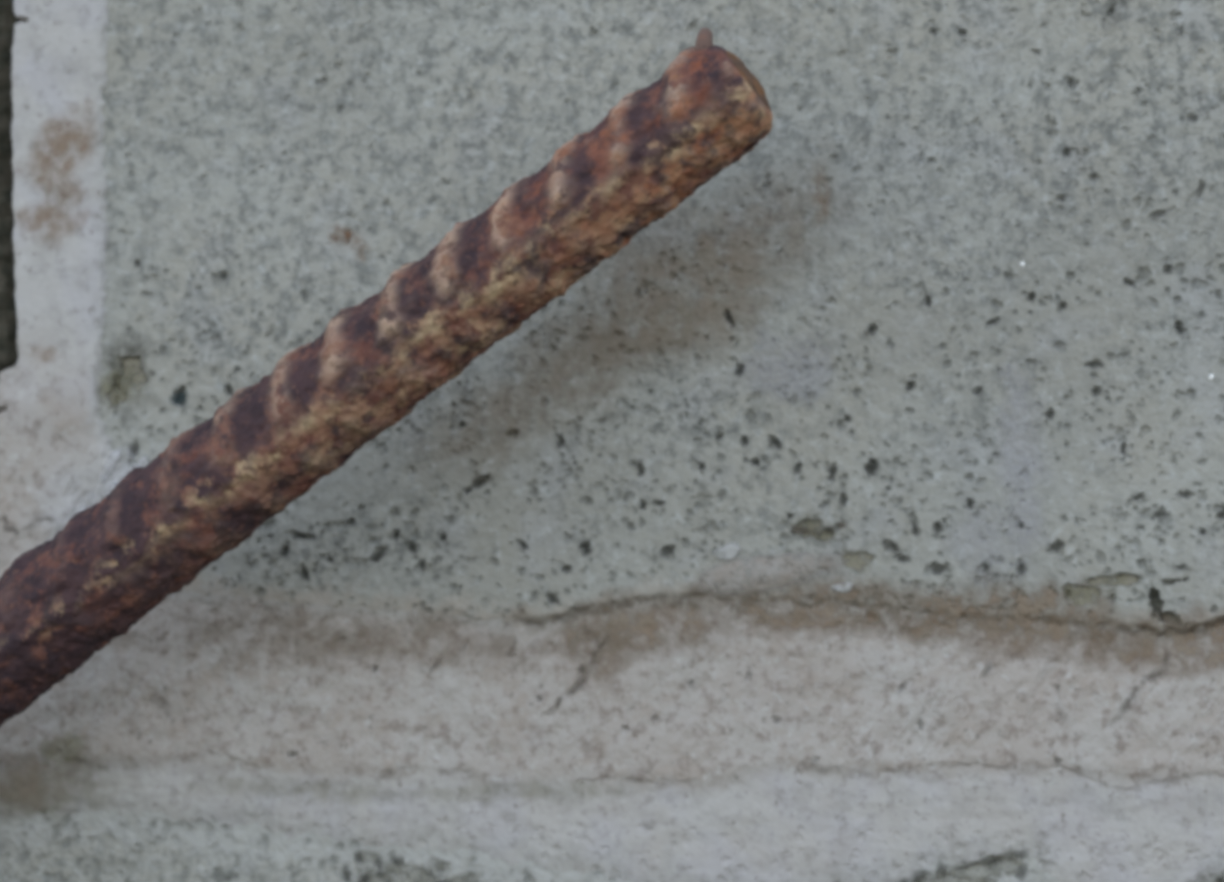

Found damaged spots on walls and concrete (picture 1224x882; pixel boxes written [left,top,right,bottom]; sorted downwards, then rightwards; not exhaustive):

rust [38,127,88,180]
leakage [564,604,707,675]
leakage [740,581,1224,671]